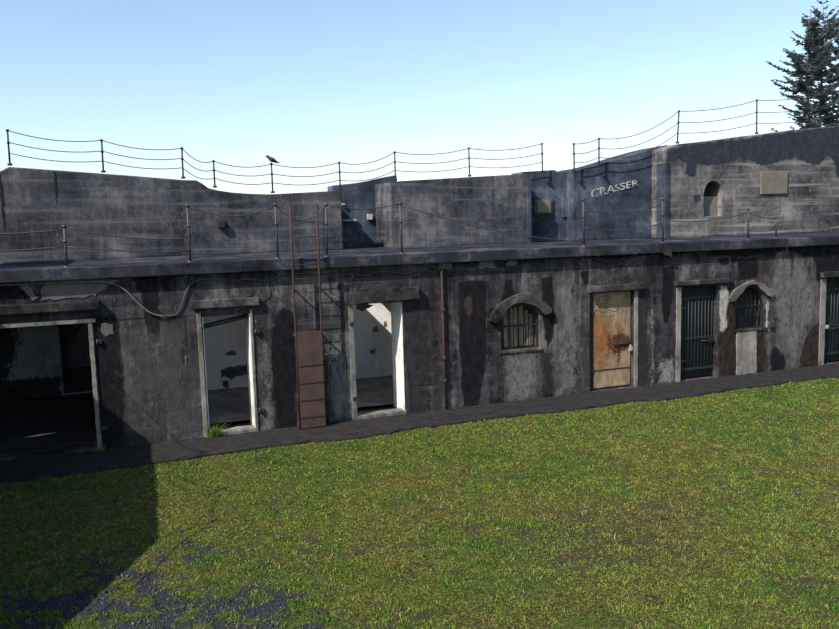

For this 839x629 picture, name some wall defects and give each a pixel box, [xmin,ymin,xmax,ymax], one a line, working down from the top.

peeling [19,279,118,301]
water stain [259,272,297,429]
water stain [451,253,674,407]
rust [594,318,631,366]
peeling [719,286,729,332]
water stain [672,245,839,377]
peeling [221,364,248,388]